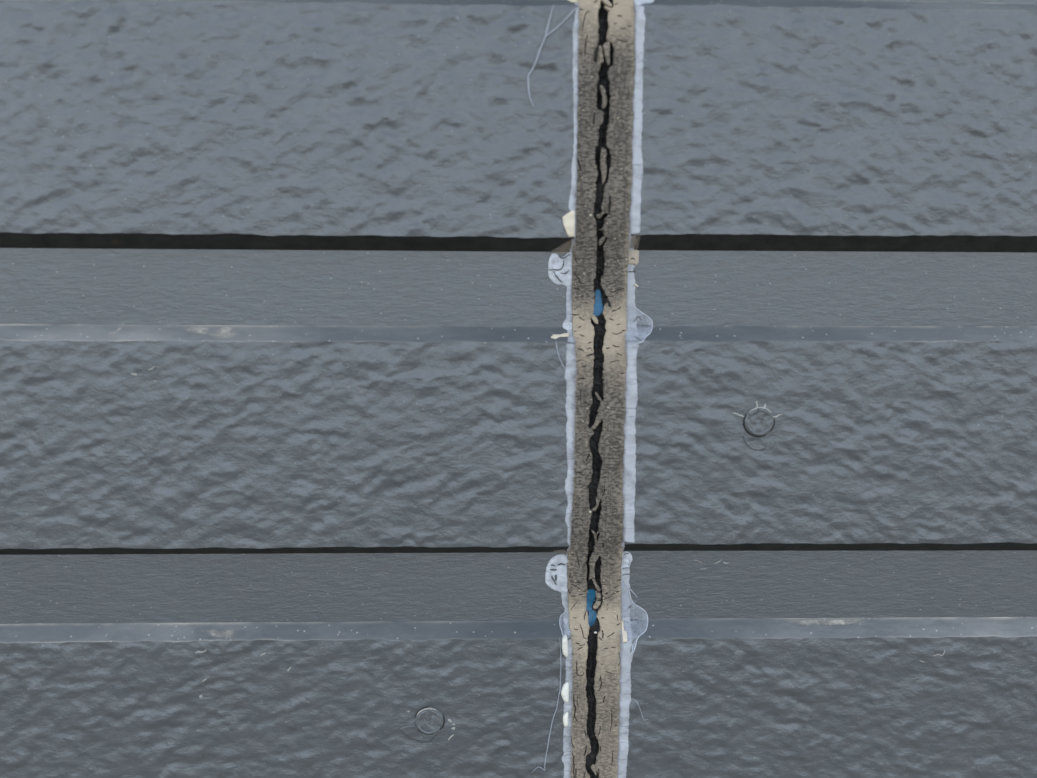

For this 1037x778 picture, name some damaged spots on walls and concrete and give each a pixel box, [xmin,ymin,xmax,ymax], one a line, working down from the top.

crack [550,0,651,778]